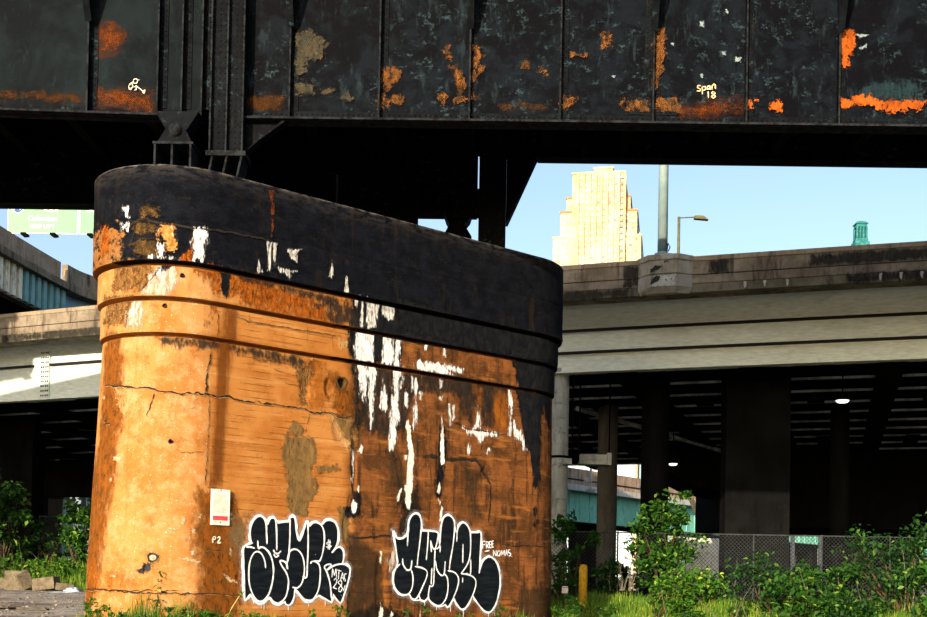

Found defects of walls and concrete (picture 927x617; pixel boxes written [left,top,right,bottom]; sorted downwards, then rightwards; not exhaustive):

rust [0,90,80,105]
peeling [293,28,354,102]
spalling [103,206,178,329]
crack [105,314,359,496]
spalling [280,420,341,517]